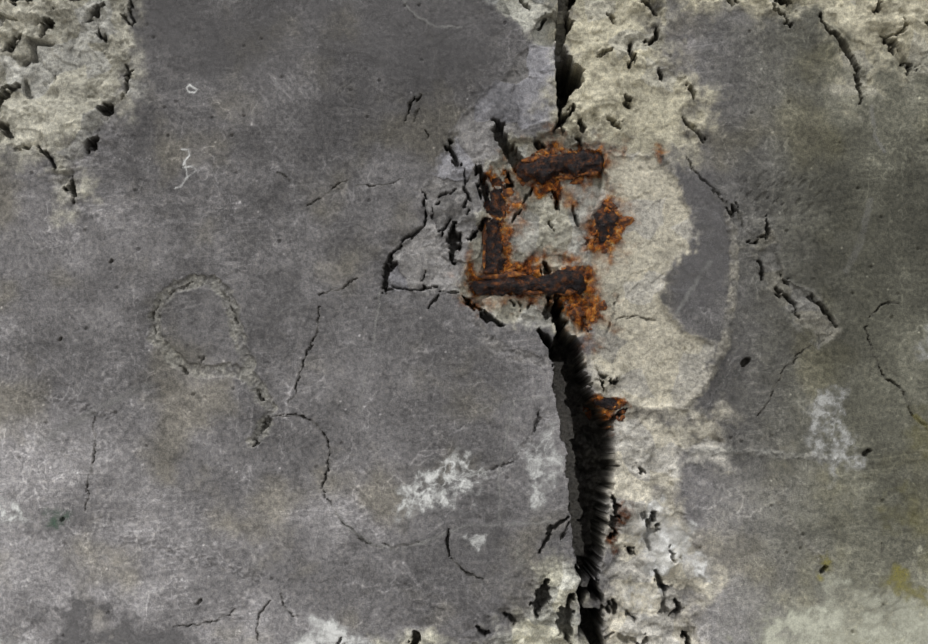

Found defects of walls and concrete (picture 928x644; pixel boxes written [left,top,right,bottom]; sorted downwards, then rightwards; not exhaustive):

spalling [0,0,137,201]
spalling [696,0,928,109]
corrosion [484,141,610,278]
corrosion [585,198,635,254]
crack [272,277,419,551]
spalling [385,0,726,644]
corrosion [507,252,607,332]
corrosion [583,395,627,429]
spalling [752,234,839,347]
crack [864,302,928,433]
crack [445,528,484,581]
crack [538,516,571,554]